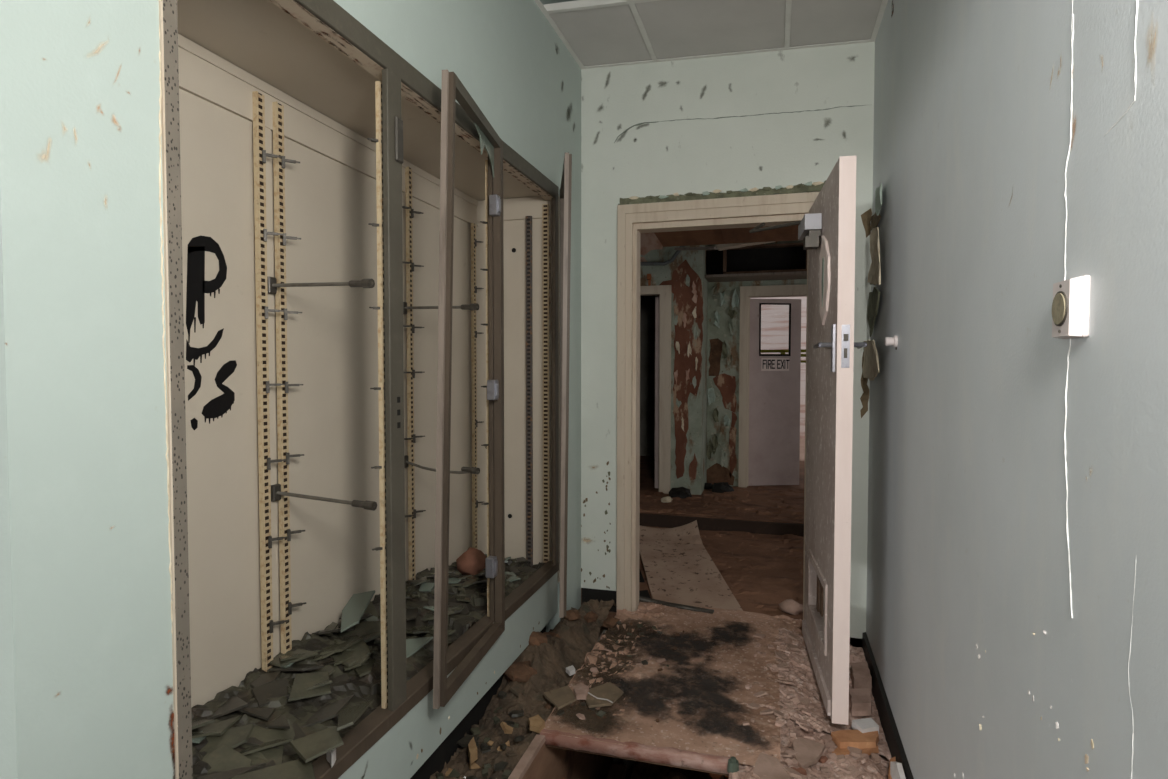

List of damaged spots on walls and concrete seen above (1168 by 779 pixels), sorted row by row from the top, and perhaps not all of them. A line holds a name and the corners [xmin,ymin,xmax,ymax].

peeling [640,233,663,262]
spalling [660,260,739,485]
peeling [860,183,882,418]
crack [1064,338,1073,618]
crack [1064,0,1074,280]
crack [1105,0,1138,135]
crack [1128,564,1136,779]